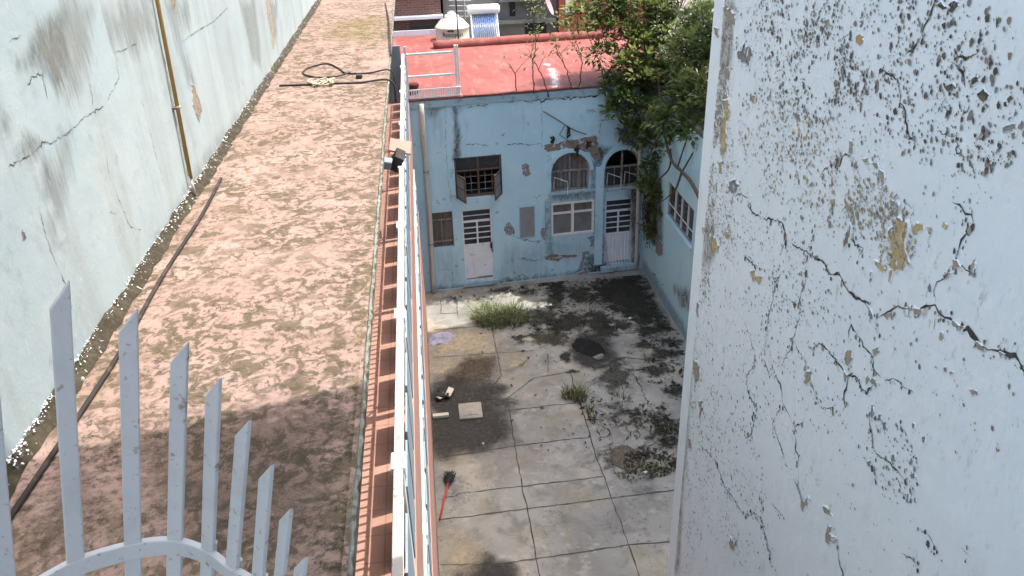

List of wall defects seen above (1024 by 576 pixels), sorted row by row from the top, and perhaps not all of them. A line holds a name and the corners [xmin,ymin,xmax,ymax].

leakage [31,3,89,93]
leakage [243,5,260,62]
crack [8,4,190,185]
spalling [543,135,601,160]
peeling [107,69,271,318]
spalling [503,221,515,236]
peeling [678,0,1024,576]
leakage [430,330,496,373]
crack [734,193,1024,483]
peeling [6,394,55,466]